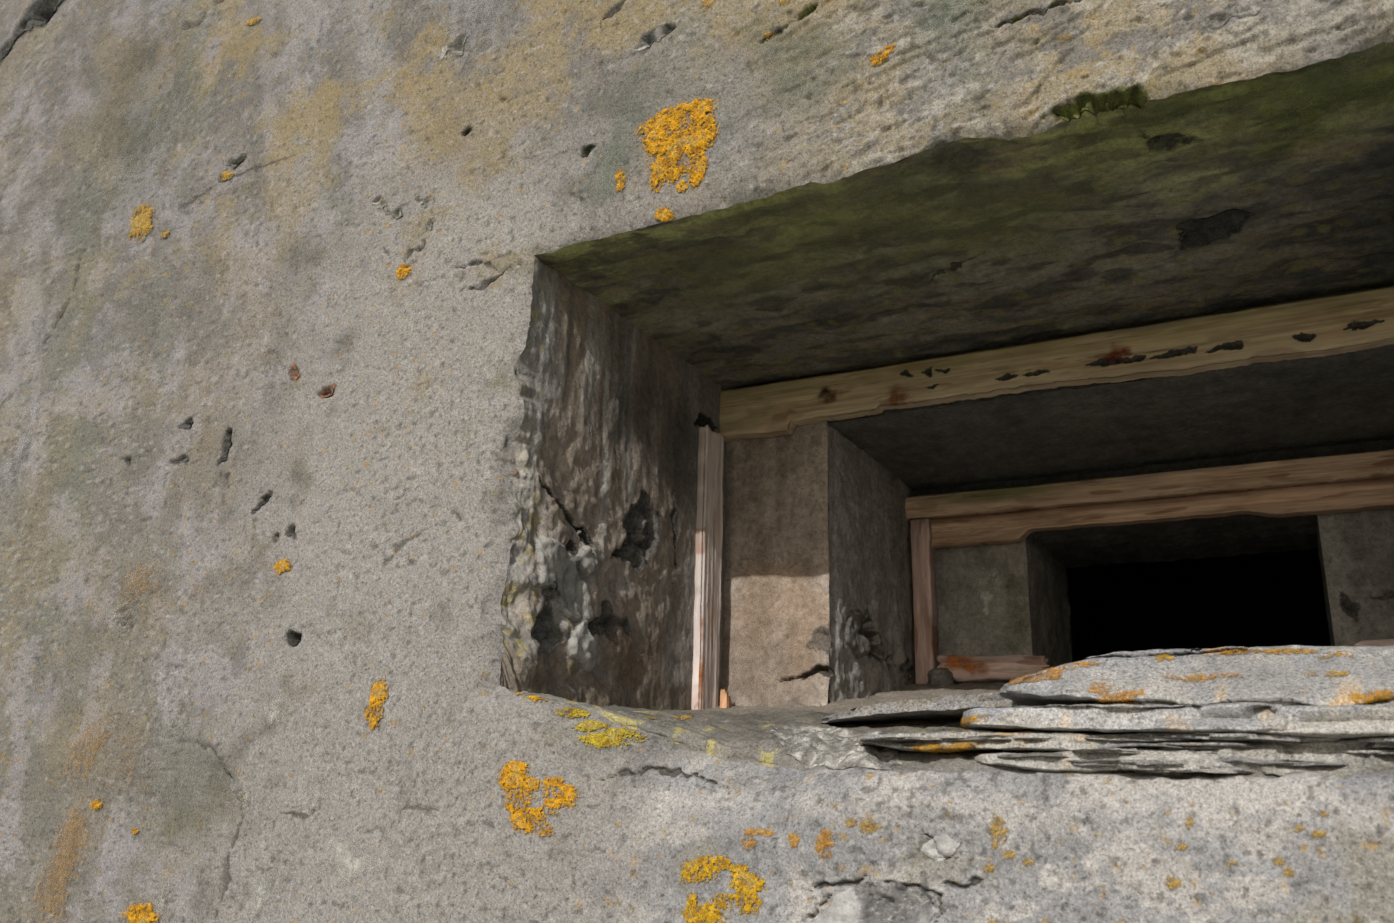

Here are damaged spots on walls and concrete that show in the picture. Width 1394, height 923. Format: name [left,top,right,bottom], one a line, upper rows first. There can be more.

spalling [0,0,62,60]
spalling [633,22,676,51]
crack [952,0,1082,28]
crack [540,480,586,551]
peeling [531,490,662,655]
spalling [855,609,914,680]
peeling [921,834,960,867]
peeling [815,879,942,923]